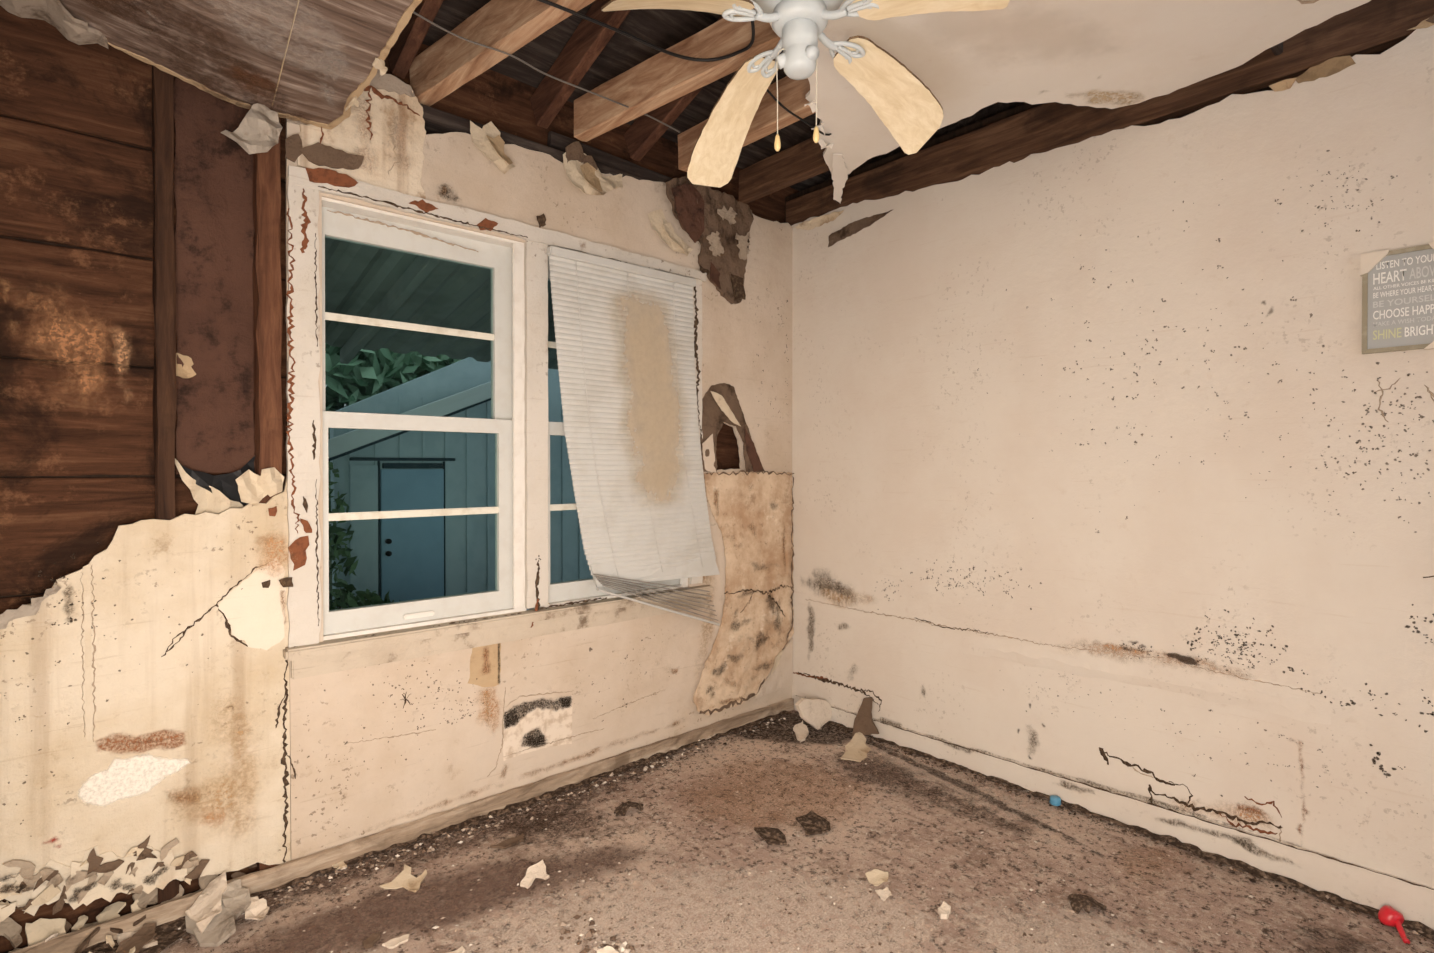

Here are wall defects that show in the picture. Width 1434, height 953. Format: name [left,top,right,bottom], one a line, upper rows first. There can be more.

flaking render [1408,15,1434,30]
flaking render [1269,55,1356,92]
water stain [1275,150,1384,236]
mould [1063,320,1186,407]
mould [1293,352,1434,533]
water stain [1090,603,1434,733]
crack [1099,747,1282,842]
flaking render [0,836,210,922]